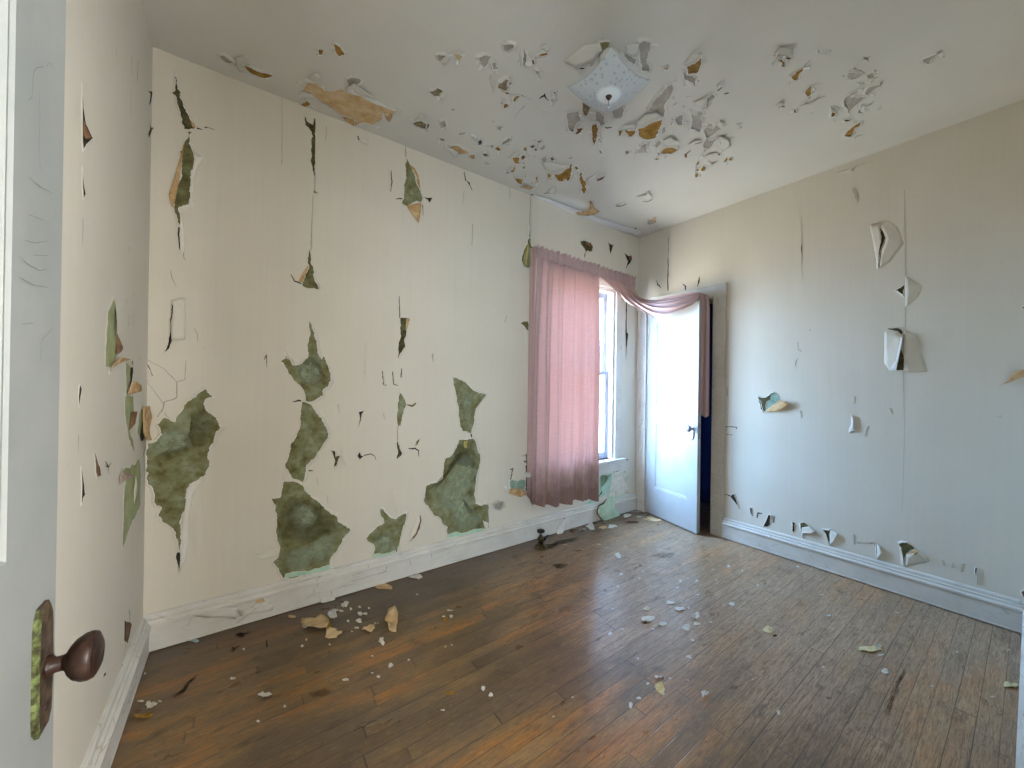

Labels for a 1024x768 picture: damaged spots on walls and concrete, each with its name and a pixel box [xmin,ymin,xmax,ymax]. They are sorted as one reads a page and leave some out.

peeling [295,73,607,216]
peeling [564,37,743,178]
peeling [772,47,883,139]